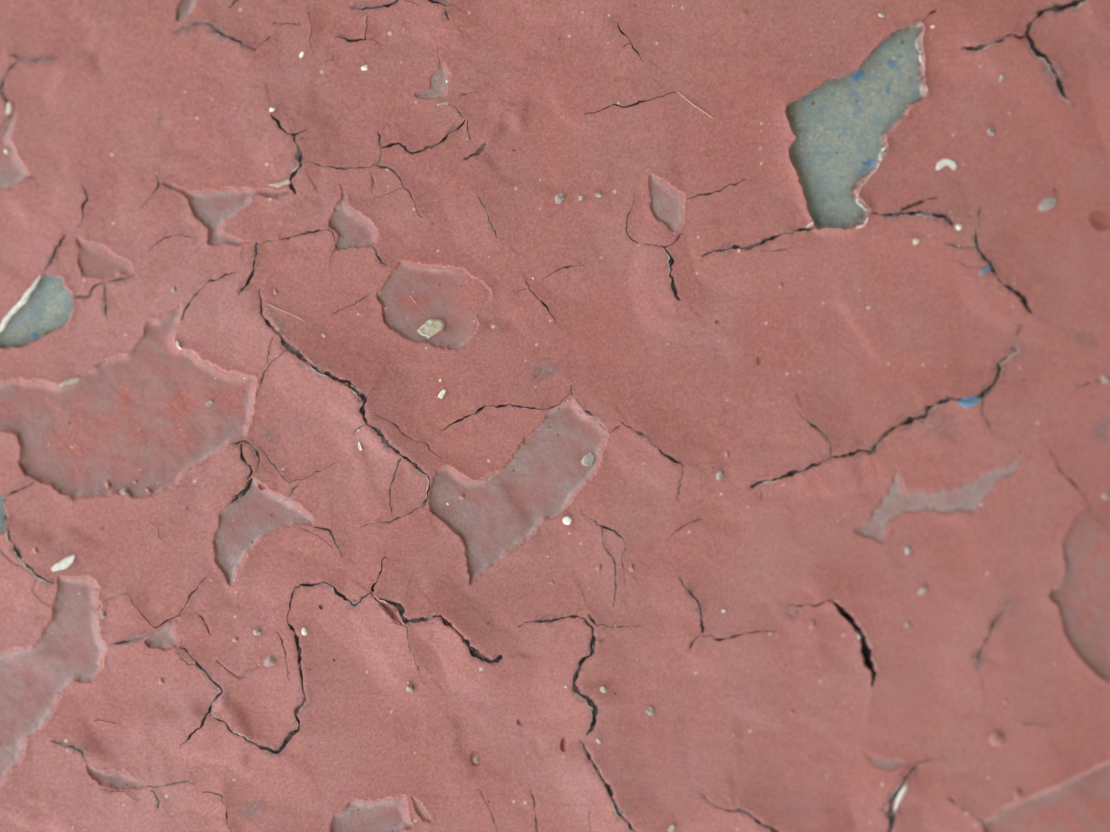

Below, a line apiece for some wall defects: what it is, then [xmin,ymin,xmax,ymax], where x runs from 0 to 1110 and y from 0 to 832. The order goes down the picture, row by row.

peeling [786,23,928,229]
crack [961,0,1087,108]
peeling [0,273,73,349]
peeling [0,304,258,500]
peeling [213,477,315,585]
crack [175,229,703,558]
peeling [429,396,609,585]
crack [750,197,1032,501]
peeling [0,555,107,788]
crack [94,556,502,755]
crack [517,512,642,832]
crack [99,781,232,832]